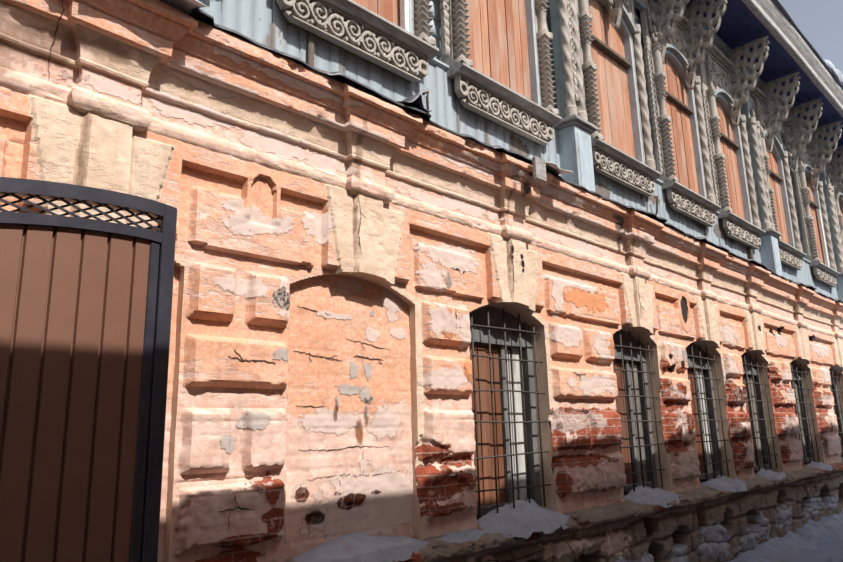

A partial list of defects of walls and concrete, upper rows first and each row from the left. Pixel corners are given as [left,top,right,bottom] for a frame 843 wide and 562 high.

crack [48,0,64,81]
peeling [44,46,359,176]
peeling [430,149,765,279]
crack [229,349,276,364]
peeling [195,443,477,562]
crack [297,339,389,364]
peeling [411,240,480,393]
peeling [543,272,599,348]
spalling [548,407,626,502]
spalling [660,336,701,489]
spalling [768,364,803,464]
peeling [811,336,841,452]